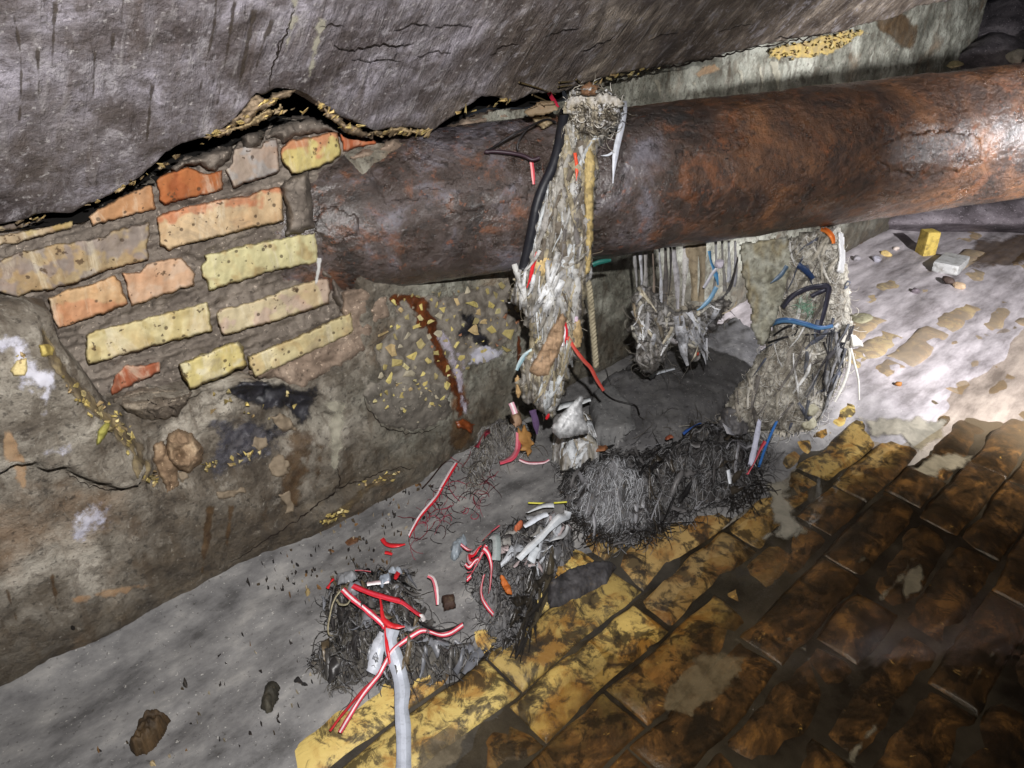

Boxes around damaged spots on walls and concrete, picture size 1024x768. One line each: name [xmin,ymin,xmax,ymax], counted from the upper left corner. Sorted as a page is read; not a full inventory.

crack [0,10,563,232]
spalling [201,90,433,144]
spalling [114,154,180,193]
spalling [10,352,28,376]
leakage [0,337,53,398]
corrosion [390,294,475,449]
spalling [39,329,159,487]
crack [69,476,125,491]
leakage [209,401,346,505]